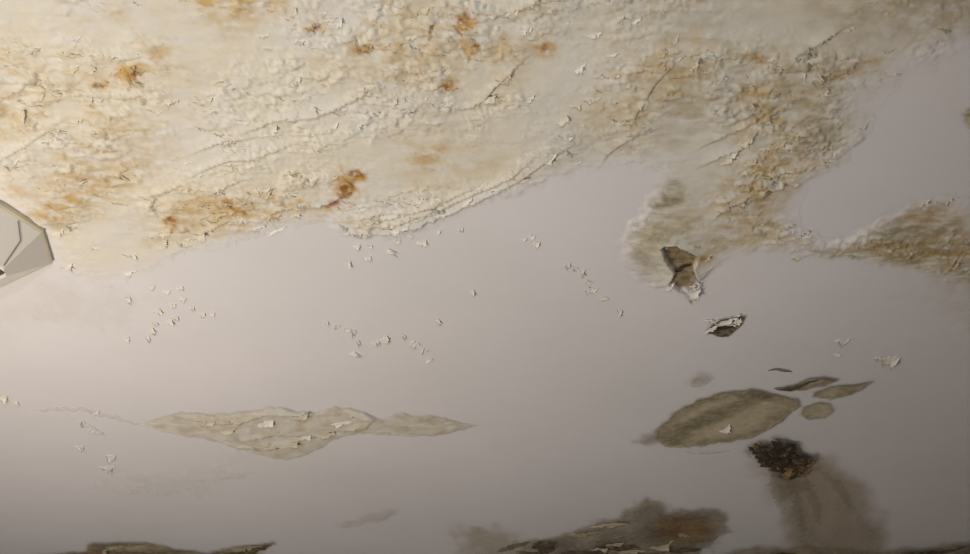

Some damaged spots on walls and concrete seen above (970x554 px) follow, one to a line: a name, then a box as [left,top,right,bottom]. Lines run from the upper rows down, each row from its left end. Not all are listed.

rust [299,15,337,38]
rust [343,38,380,63]
rust [444,8,489,61]
rust [427,72,467,98]
peeling [0,0,970,303]
rust [317,166,371,216]
spalling [704,314,744,337]
peeling [147,407,471,460]
spalling [655,378,872,448]
water stain [748,441,815,498]
spalling [73,543,198,554]
spalling [497,501,726,554]